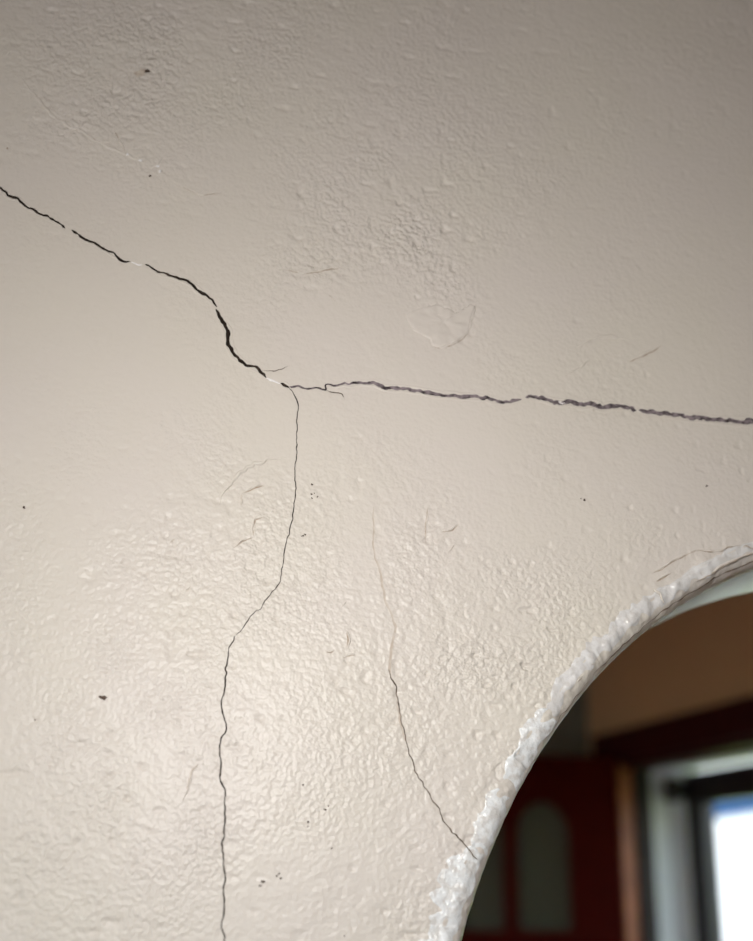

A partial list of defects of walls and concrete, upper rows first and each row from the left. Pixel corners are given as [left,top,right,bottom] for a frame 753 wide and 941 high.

crack [0,185,65,228]
crack [72,230,753,941]
peeling [419,541,753,941]